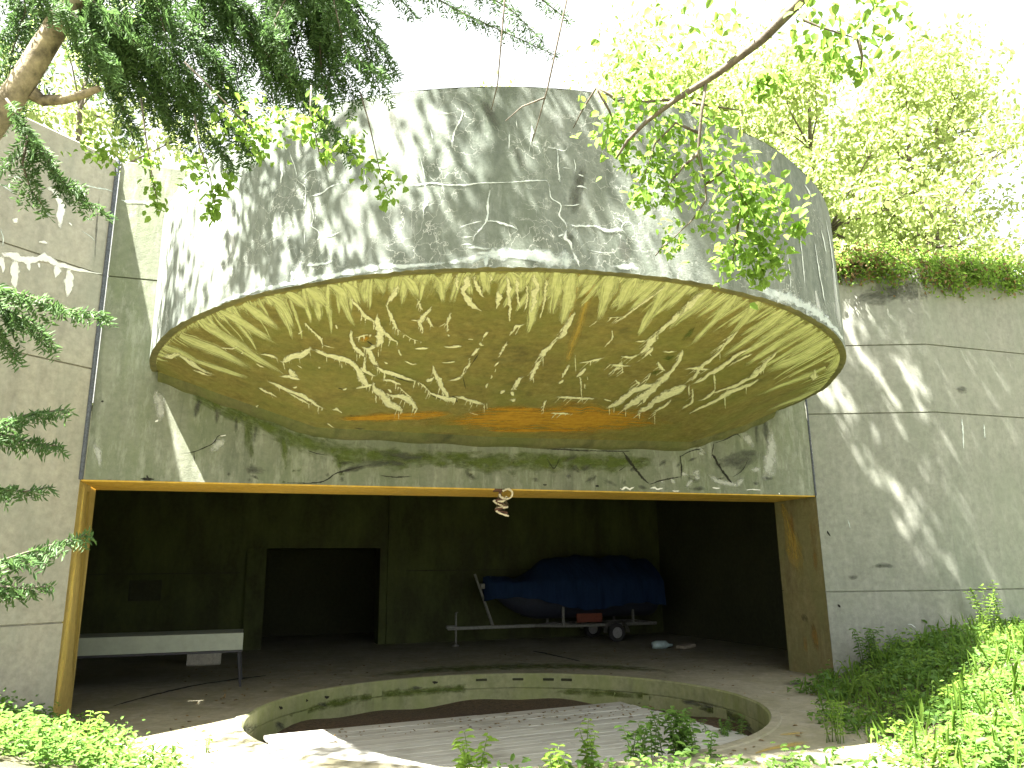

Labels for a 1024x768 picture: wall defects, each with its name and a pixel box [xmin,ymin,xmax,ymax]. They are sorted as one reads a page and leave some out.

crack [289,153,339,243]
crack [413,112,628,267]
damp [156,221,843,440]
crack [300,451,411,484]
corrosion [345,402,655,432]
crack [548,434,747,484]